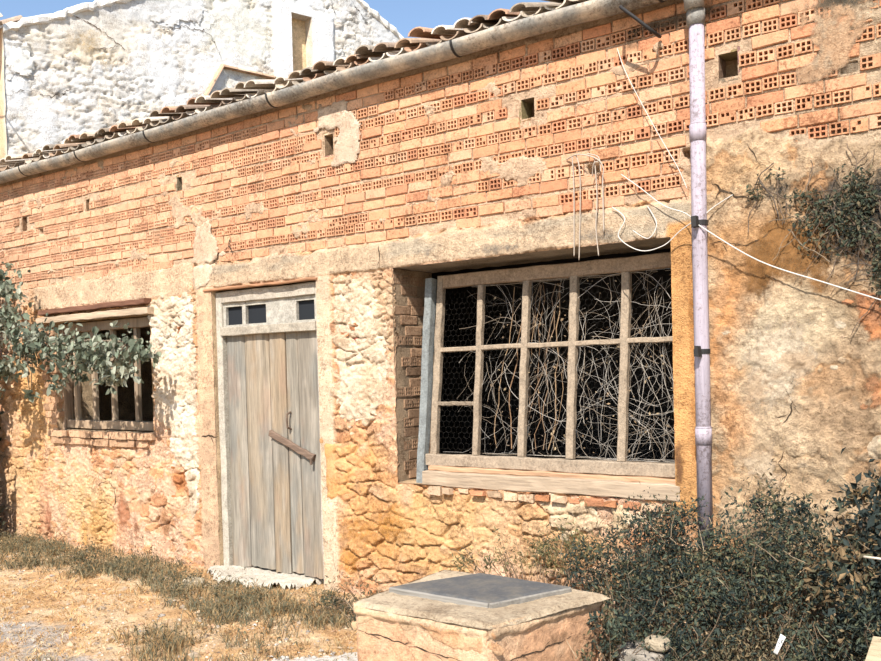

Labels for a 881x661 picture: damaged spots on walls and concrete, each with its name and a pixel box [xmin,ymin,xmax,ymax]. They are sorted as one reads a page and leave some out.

crack [75,16,125,50]
crack [163,21,220,55]
flaking render [313,100,361,167]
crack [712,184,756,200]
spalling [842,290,881,340]
crack [359,630,460,661]
crack [510,629,585,661]